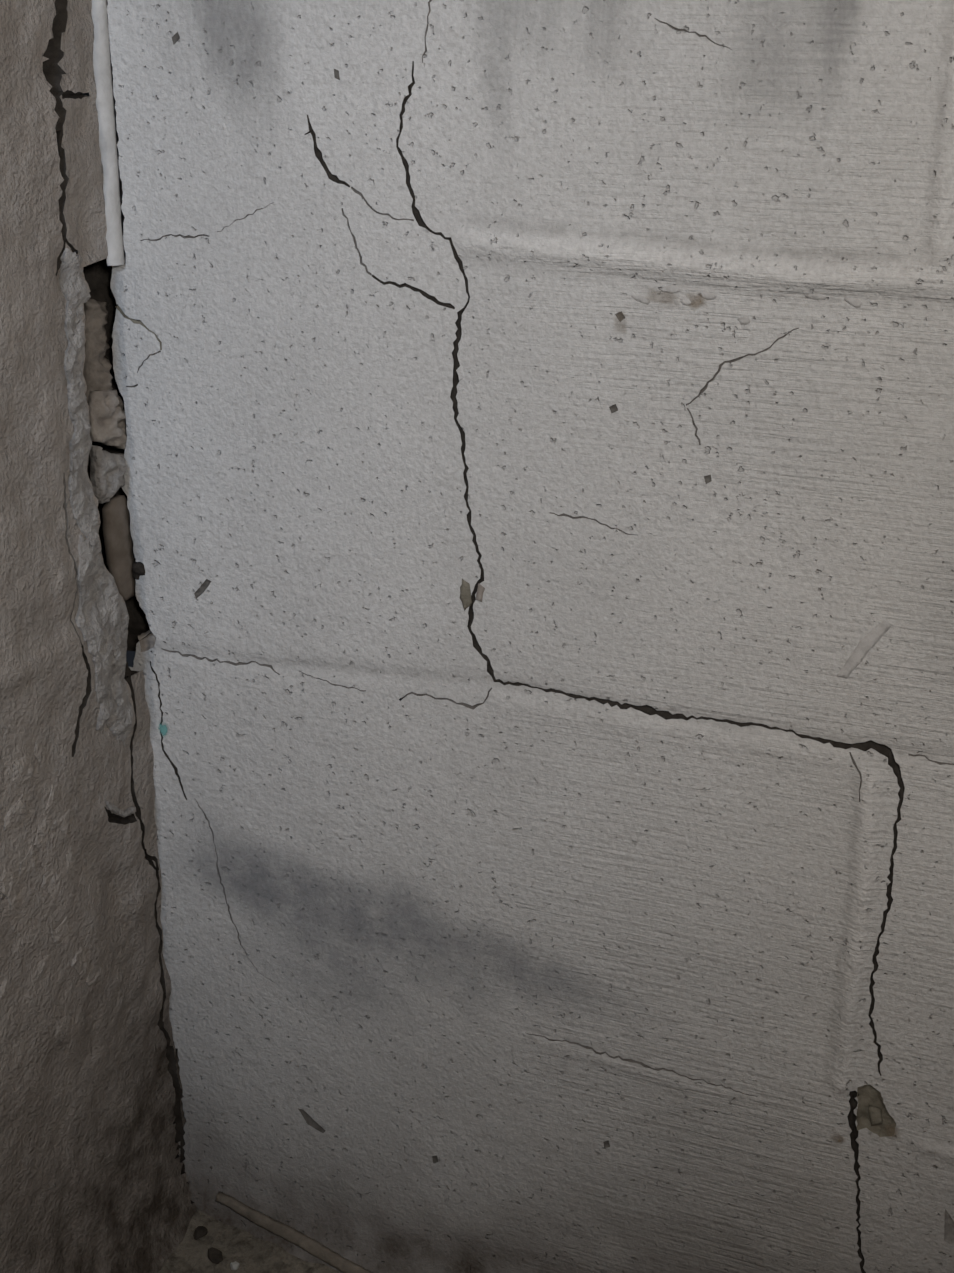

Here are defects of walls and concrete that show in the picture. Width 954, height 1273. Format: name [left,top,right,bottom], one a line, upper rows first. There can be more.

crack [43,0,119,276]
peeling [58,248,162,746]
crack [305,0,954,1273]